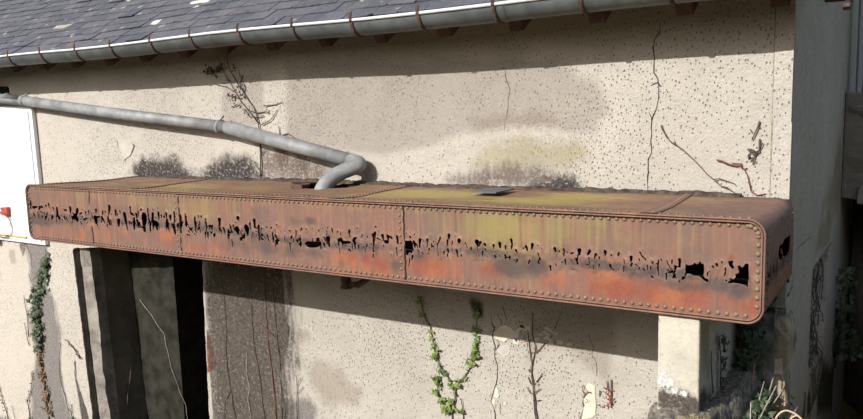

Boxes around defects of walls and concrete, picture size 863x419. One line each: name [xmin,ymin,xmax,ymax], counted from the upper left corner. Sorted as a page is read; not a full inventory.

crack [647,22,662,190]
leakage [134,157,191,177]
leakage [204,149,322,179]
leakage [468,167,579,188]
leakage [205,260,314,419]
peeling [493,323,573,356]
peeling [581,382,596,419]